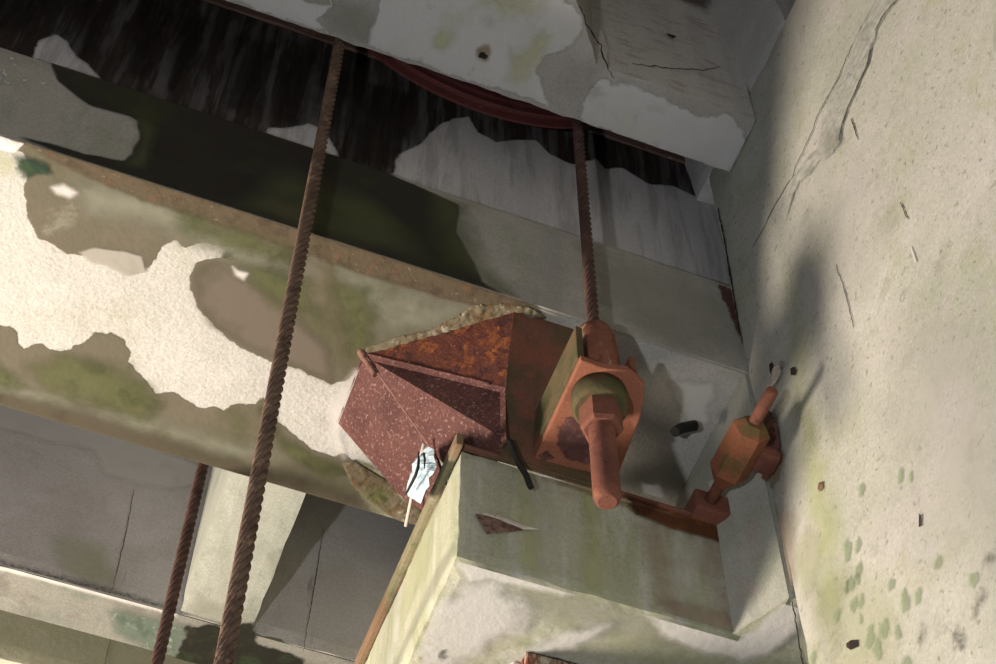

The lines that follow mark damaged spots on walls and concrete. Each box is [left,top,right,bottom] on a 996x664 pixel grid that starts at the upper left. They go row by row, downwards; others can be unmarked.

flaking render [236,0,333,33]
flaking render [368,0,583,107]
peeling [0,136,24,153]
leakage [0,0,695,362]
flaking render [580,78,745,172]
leakage [0,326,265,477]
leakage [266,253,473,512]
peeling [0,405,197,488]
leakage [0,561,163,612]
leakage [175,625,220,664]
leakage [233,623,302,664]